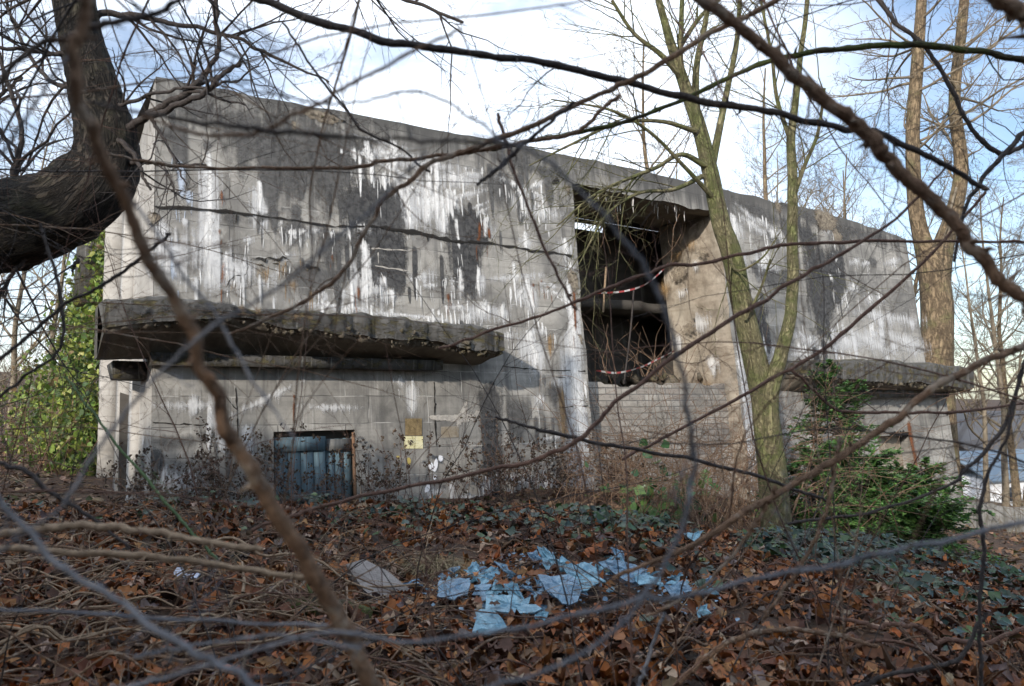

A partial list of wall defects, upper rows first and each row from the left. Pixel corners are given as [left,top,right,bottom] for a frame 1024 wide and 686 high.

water stain [155,99,594,499]
water stain [727,200,927,360]
water stain [134,395,231,500]